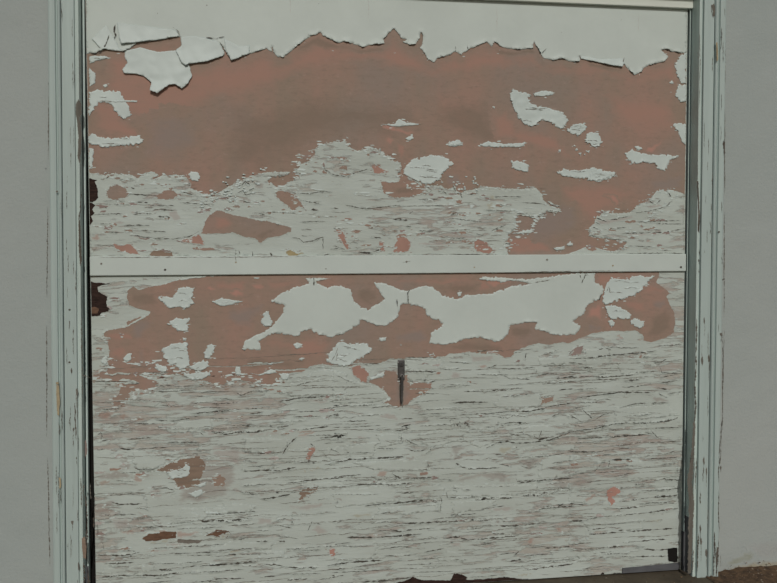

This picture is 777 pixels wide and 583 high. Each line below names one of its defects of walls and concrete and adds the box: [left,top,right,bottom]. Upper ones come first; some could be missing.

peeling [76,49,687,265]
crack [46,319,725,583]
peeling [93,271,719,583]